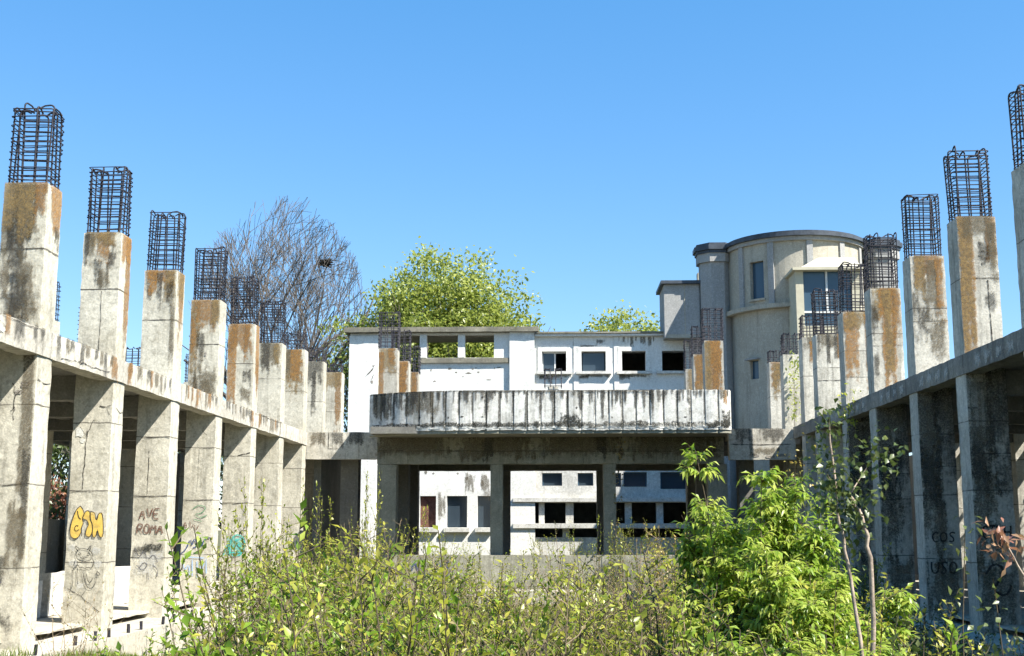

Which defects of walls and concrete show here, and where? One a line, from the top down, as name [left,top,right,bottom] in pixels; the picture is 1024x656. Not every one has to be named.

corrosion [0,182,62,253]
corrosion [86,232,132,340]
corrosion [146,270,260,404]
corrosion [843,288,901,387]
corrosion [914,255,945,315]
corrosion [956,216,998,351]
water stain [0,355,35,581]
water stain [311,374,784,496]
water stain [966,342,1018,632]